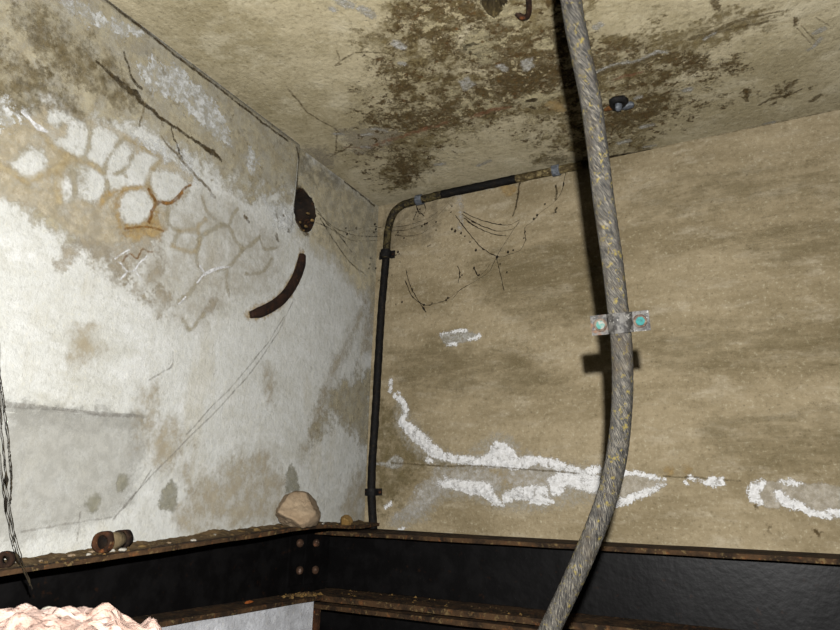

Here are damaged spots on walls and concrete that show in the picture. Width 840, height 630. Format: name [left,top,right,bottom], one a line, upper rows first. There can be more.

crack [113,5,300,189]
damp [582,0,769,153]
damp [764,79,822,104]
damp [0,0,588,275]
crack [0,52,277,331]
corrosion [247,252,306,320]
damp [309,369,371,445]
damp [159,453,300,533]
damp [343,378,603,530]
damp [615,469,667,508]
damp [683,474,725,488]
damp [746,477,840,520]